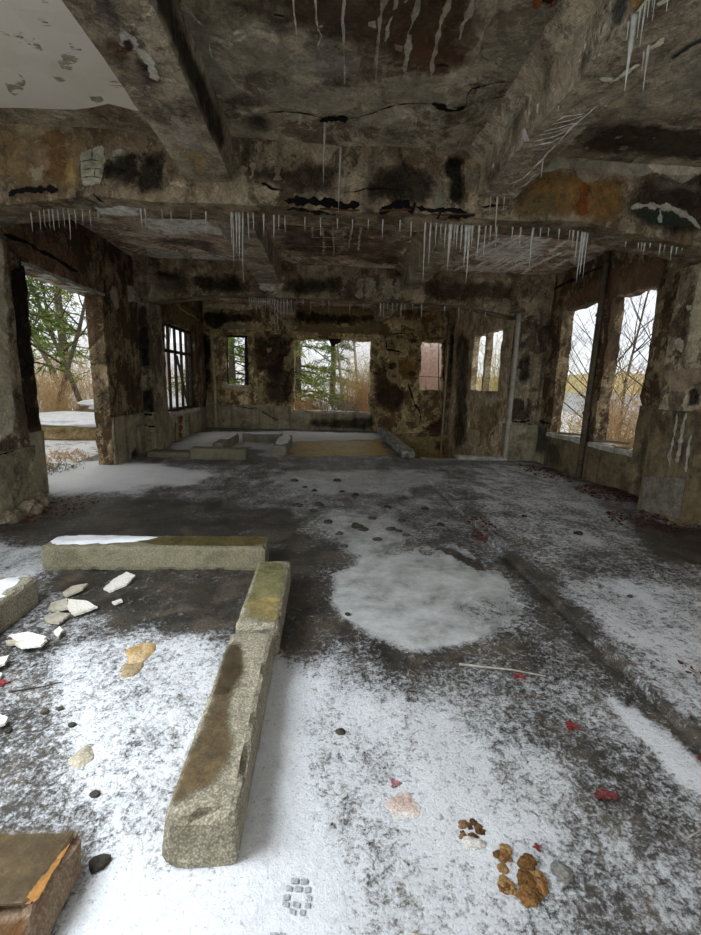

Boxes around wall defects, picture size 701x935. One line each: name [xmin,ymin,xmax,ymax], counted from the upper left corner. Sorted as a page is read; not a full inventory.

peeling [6,76,26,95]
peeling [54,44,81,82]
leakage [374,0,398,81]
crack [269,82,516,123]
leakage [402,0,421,73]
leakage [430,0,451,77]
leakage [458,0,475,40]
crack [8,184,58,197]
corrosion [518,171,622,220]
leakage [94,206,240,261]
leakage [302,227,401,263]
leakage [667,388,700,472]